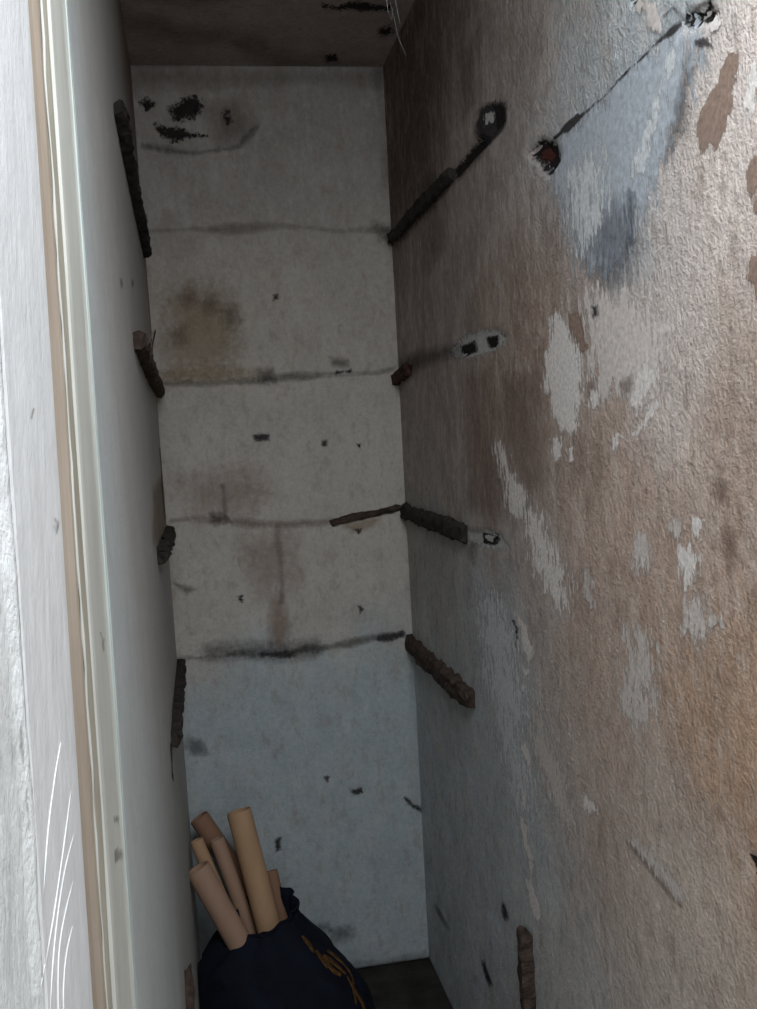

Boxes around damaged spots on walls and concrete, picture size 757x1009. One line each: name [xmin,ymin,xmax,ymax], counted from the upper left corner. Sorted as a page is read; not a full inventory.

spalling [631,0,662,34]
spalling [686,0,723,48]
spalling [153,94,208,144]
spalling [529,138,561,175]
crack [552,21,690,140]
leakage [550,12,710,282]
peeling [696,51,757,154]
peeling [746,154,757,214]
peeling [746,253,757,298]
peeling [540,275,697,464]
peeling [667,516,725,656]
peeling [607,612,666,739]